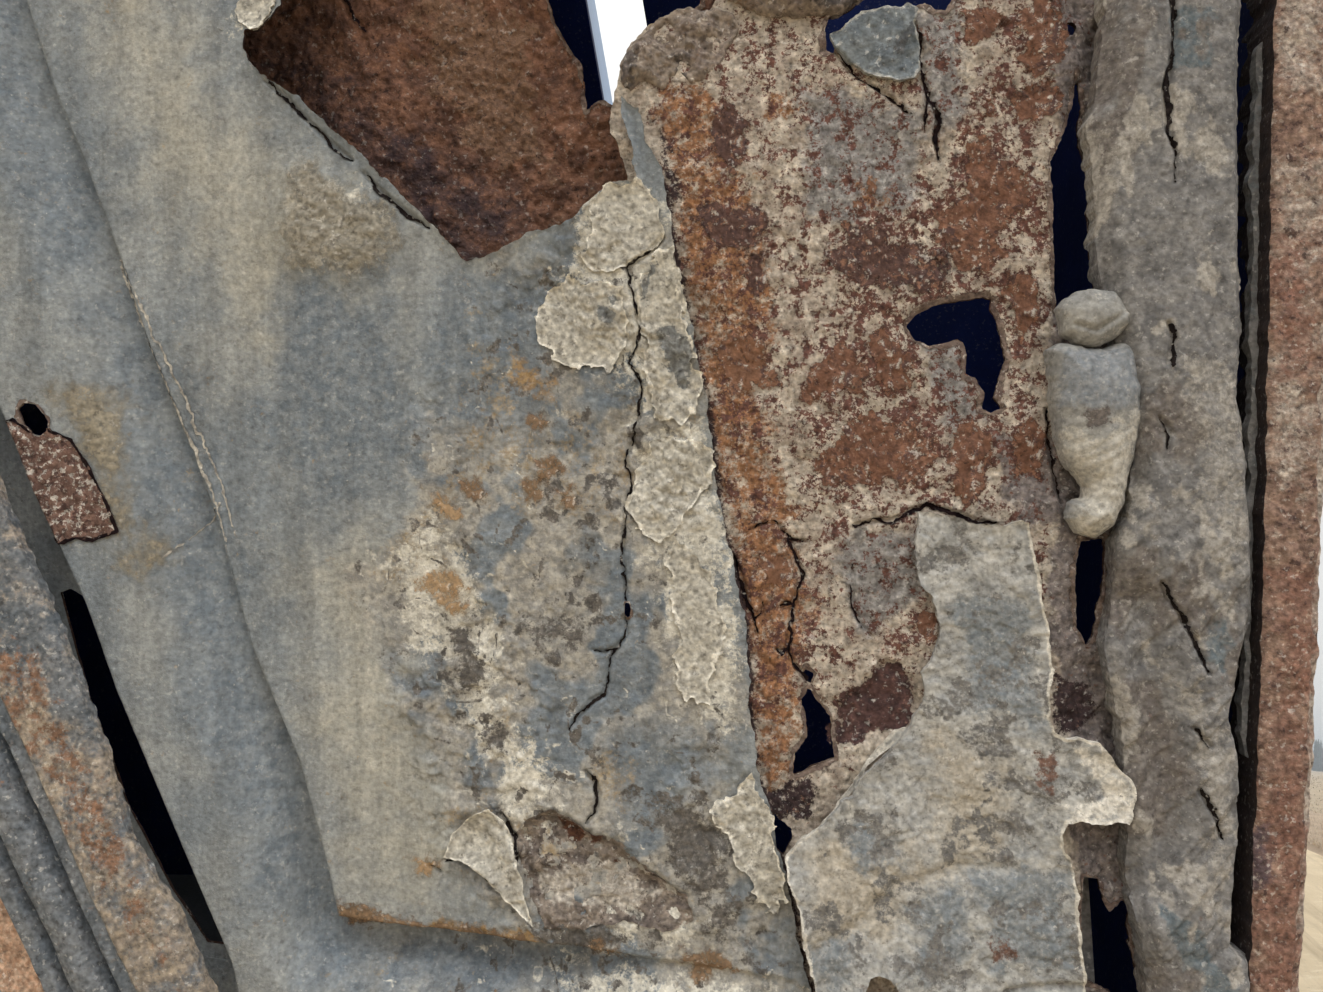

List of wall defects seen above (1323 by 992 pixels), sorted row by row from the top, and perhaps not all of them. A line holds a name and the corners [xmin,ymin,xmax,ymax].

crack [266,80,430,229]
peeling [829,2,921,82]
rust [824,133,1041,345]
rust [959,0,1070,122]
crack [1163,0,1178,182]
crack [569,250,651,731]
peeling [534,177,728,705]
crack [734,520,809,681]
rust [798,328,994,508]
crack [852,502,997,528]
rust [1230,0,1323,992]
spalling [820,662,914,825]